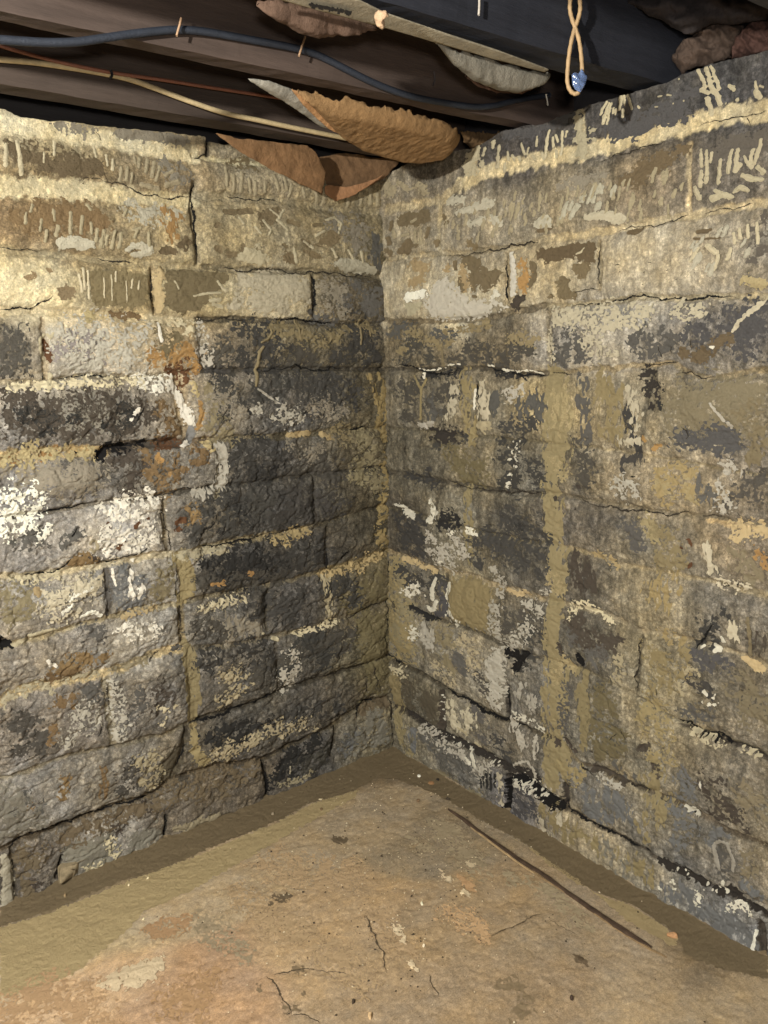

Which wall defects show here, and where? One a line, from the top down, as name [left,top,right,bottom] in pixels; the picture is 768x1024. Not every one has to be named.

crack [78,143,374,324]
rust [146,341,206,395]
crack [395,364,572,401]
damp [0,207,768,997]
crack [367,918,387,973]
crack [267,968,346,1022]